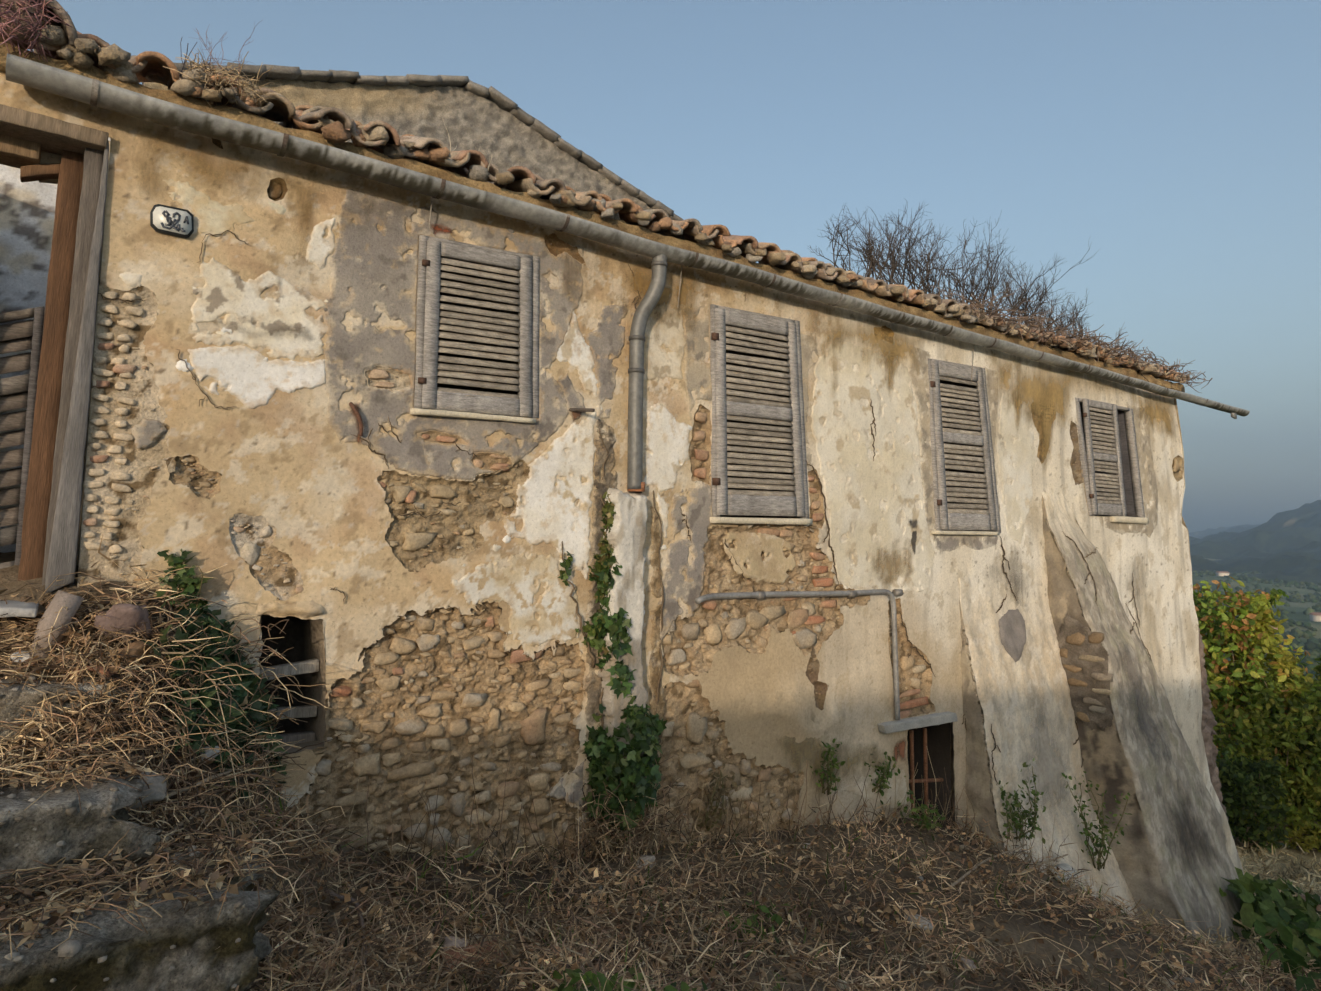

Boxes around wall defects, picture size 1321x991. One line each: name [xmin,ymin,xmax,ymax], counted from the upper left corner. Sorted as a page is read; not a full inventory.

spalling [77,272,222,588]
crack [177,349,231,409]
flaking render [176,257,328,409]
water stain [827,327,912,387]
crack [869,400,877,461]
water stain [1000,368,1070,459]
water stain [1139,401,1172,435]
spalling [229,513,304,601]
spalling [288,311,619,863]
flaking render [634,326,936,848]
crack [996,537,1017,613]
spalling [1057,613,1114,732]